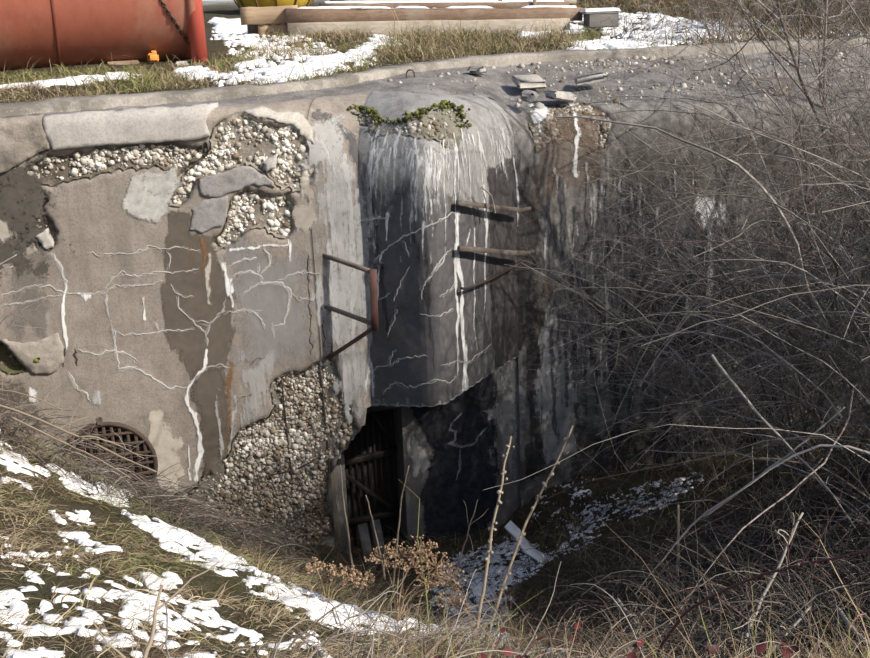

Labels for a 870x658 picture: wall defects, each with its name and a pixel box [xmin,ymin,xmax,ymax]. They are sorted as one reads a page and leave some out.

spalling [0,198,57,251]
spalling [24,106,318,251]
spalling [353,108,463,149]
spalling [529,104,613,153]
spalling [0,344,26,374]
crack [1,245,334,402]
crack [369,211,491,394]
damp [148,104,744,492]
spalling [168,358,360,546]